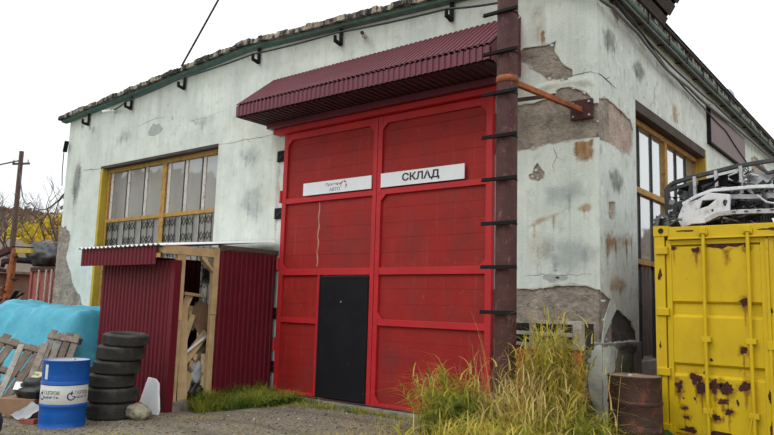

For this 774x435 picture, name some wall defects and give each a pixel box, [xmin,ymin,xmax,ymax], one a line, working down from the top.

peeling [517,40,633,156]
peeling [528,162,545,181]
peeling [517,269,636,432]
corrosion [675,347,751,435]